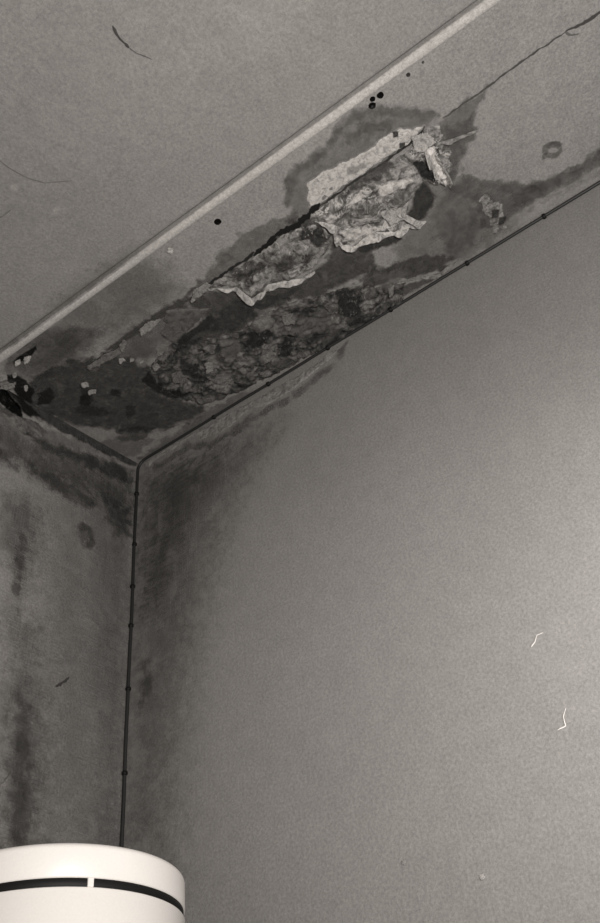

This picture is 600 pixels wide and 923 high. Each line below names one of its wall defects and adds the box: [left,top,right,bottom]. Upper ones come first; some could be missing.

damp [0,428,128,534]
damp [19,330,204,432]
peeling [0,124,479,468]
damp [179,91,600,344]
crack [209,11,600,284]